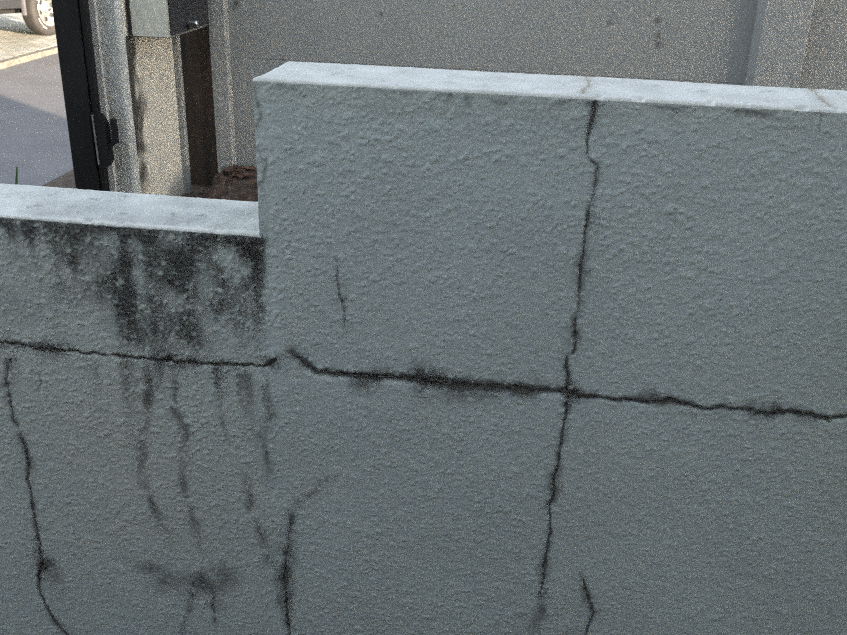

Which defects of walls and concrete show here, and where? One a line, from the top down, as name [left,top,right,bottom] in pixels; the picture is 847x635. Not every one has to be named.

crack [126,35,146,184]
crack [587,100,597,187]
leakage [0,218,264,347]
crack [578,212,590,292]
leakage [143,375,152,410]
crack [0,320,847,635]